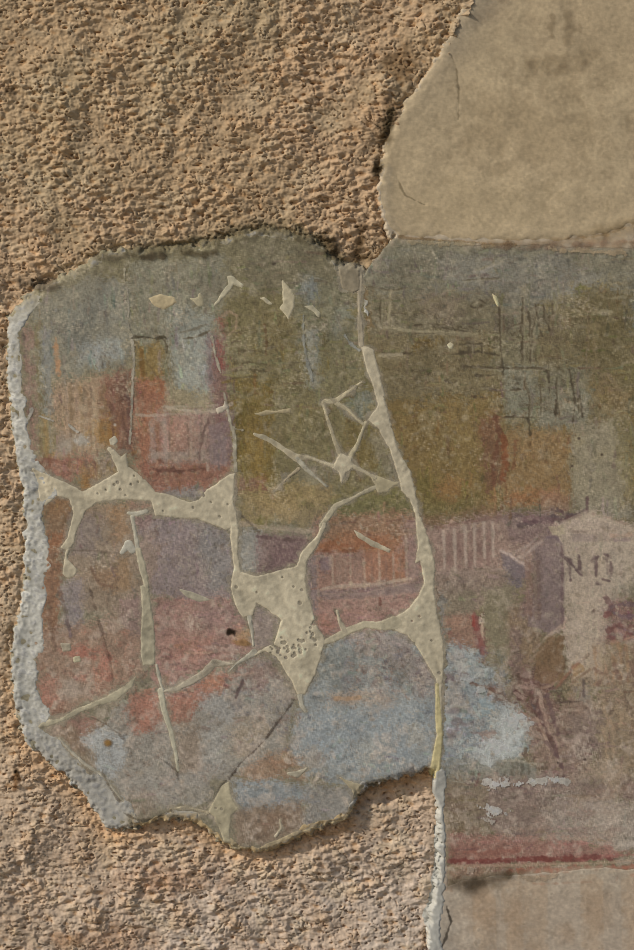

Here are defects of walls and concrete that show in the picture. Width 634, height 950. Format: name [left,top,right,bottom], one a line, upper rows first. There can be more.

peeling [149,294,176,310]
peeling [190,276,243,306]
peeling [260,280,320,319]
crack [121,268,165,444]
crack [26,407,79,433]
crack [210,335,243,472]
crack [229,703,292,779]